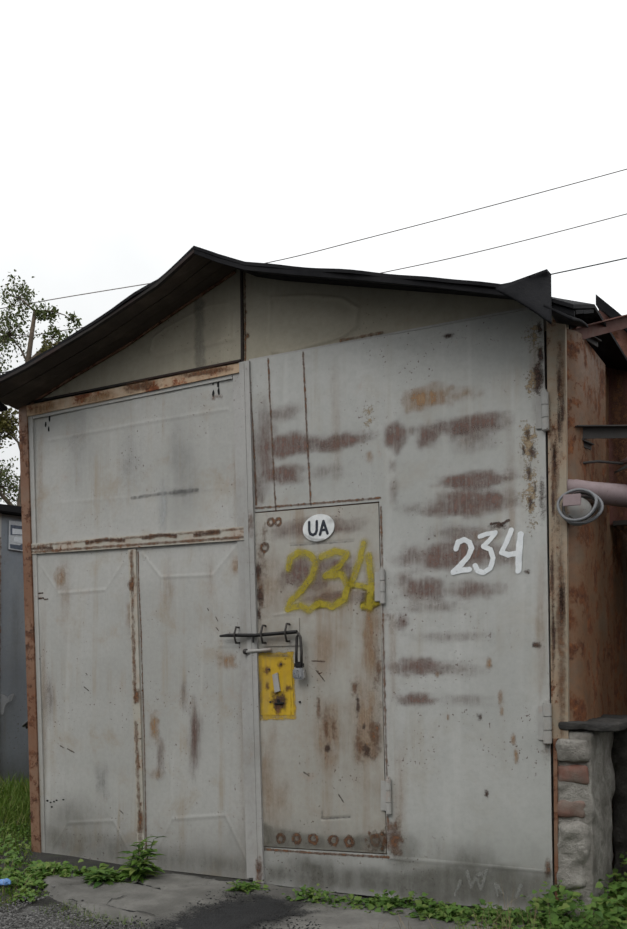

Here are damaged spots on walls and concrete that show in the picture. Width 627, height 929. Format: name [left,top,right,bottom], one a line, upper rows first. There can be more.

corrosion [386,425,405,447]
corrosion [420,414,497,445]
corrosion [432,472,507,515]
corrosion [540,442,558,516]
corrosion [31,352,383,771]
corrosion [403,578,440,597]
corrosion [550,548,566,708]
corrosion [403,659,438,675]
corrosion [353,604,388,774]
corrosion [408,694,430,703]
corrosion [137,781,147,859]
corrosion [264,816,403,859]